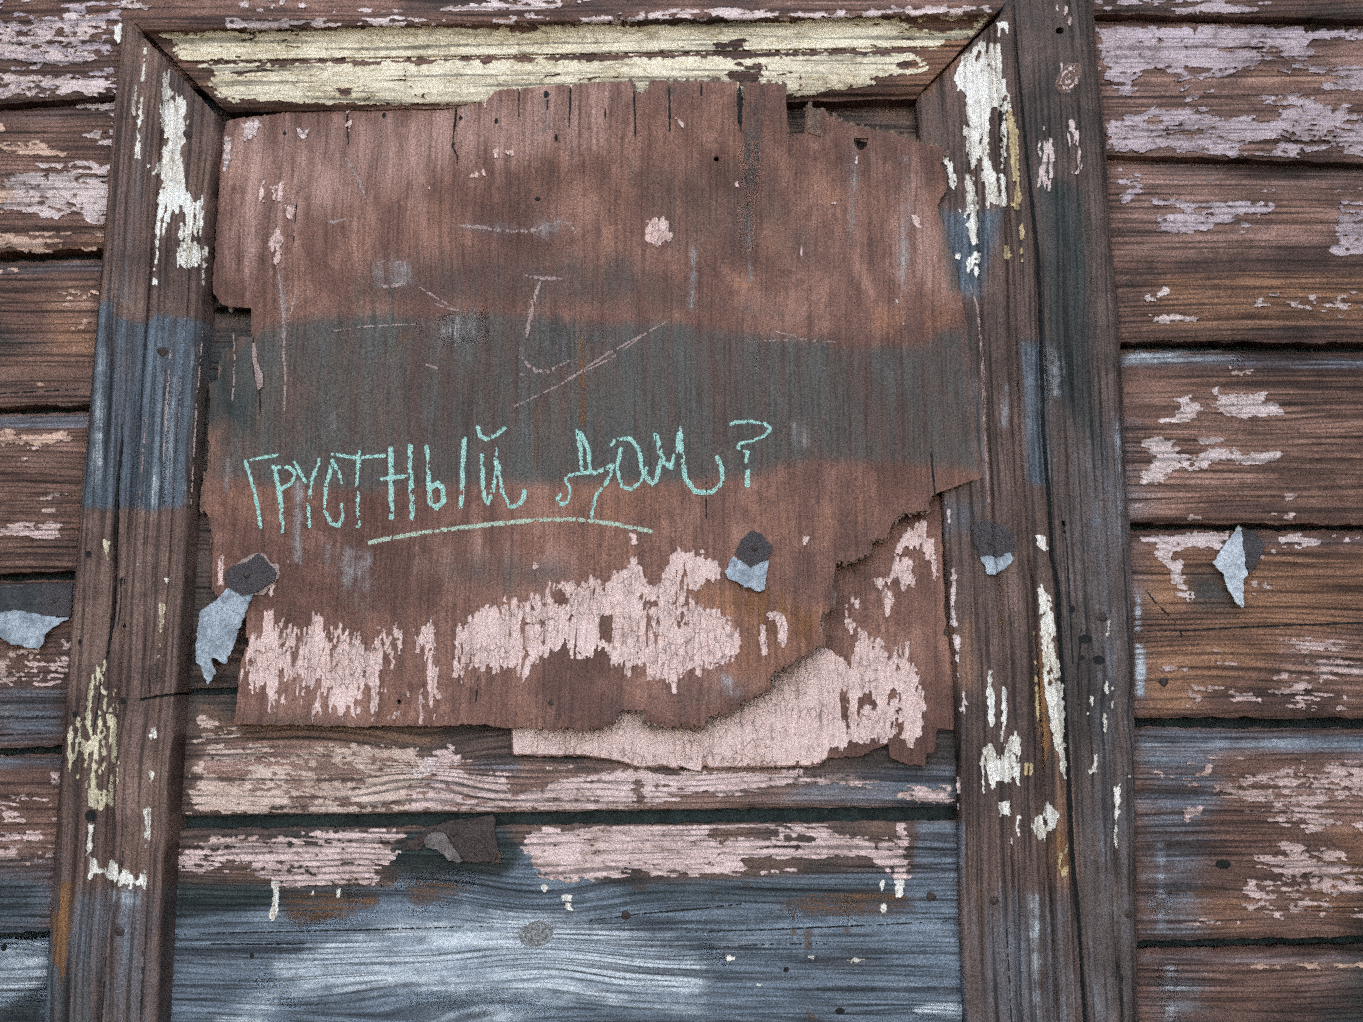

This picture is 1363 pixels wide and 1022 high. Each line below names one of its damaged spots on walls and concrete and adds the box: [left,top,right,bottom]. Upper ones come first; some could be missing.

peeling [0,123,110,254]
peeling [131,0,1025,286]
peeling [1094,0,1363,159]
peeling [1139,386,1285,485]
peeling [0,660,147,890]
peeling [178,828,407,921]
peeling [240,532,742,724]
peeling [185,597,927,814]
peeling [520,823,912,913]
peeling [979,670,1059,845]
peeling [1033,583,1067,779]
peeling [1153,756,1363,926]